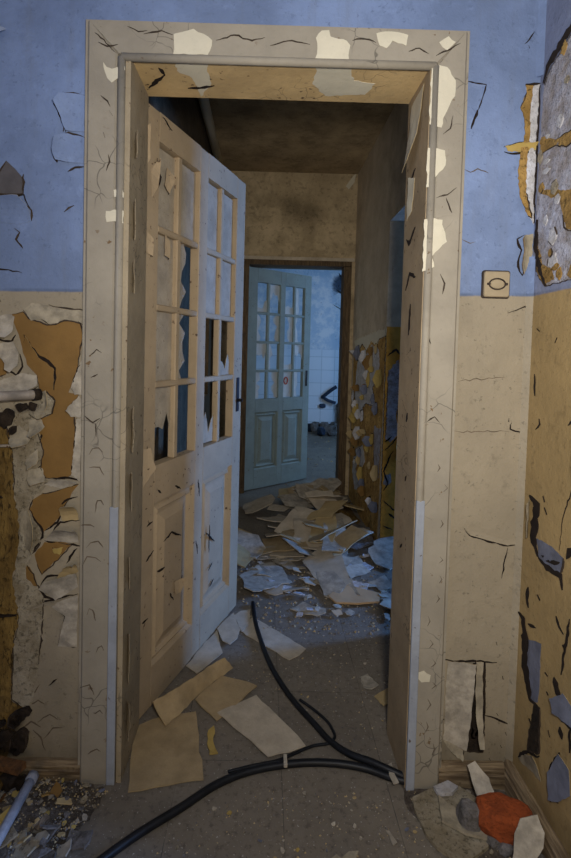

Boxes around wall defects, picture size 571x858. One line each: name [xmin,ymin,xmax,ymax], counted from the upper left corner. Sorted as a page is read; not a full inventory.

peeling [103,63,125,82]
peeling [0,161,33,248]
peeling [128,26,460,294]
flaking render [504,24,571,287]
flaking render [346,304,411,548]
crack [456,419,541,433]
peeling [0,303,104,731]
crack [543,456,571,549]
crack [525,587,540,608]
peeling [418,659,508,761]
peeling [518,611,571,803]